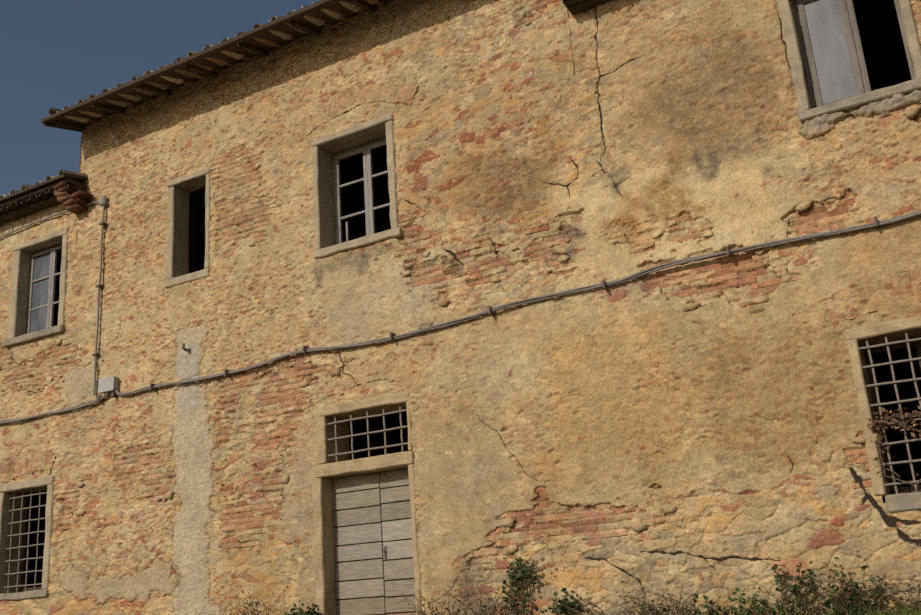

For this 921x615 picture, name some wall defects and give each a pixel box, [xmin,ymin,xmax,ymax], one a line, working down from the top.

crack [544,7,645,197]
spalling [394,210,586,307]
spalling [601,211,800,315]
spalling [782,191,858,240]
spalling [212,348,347,552]
crack [473,413,535,480]
spalling [470,487,677,576]